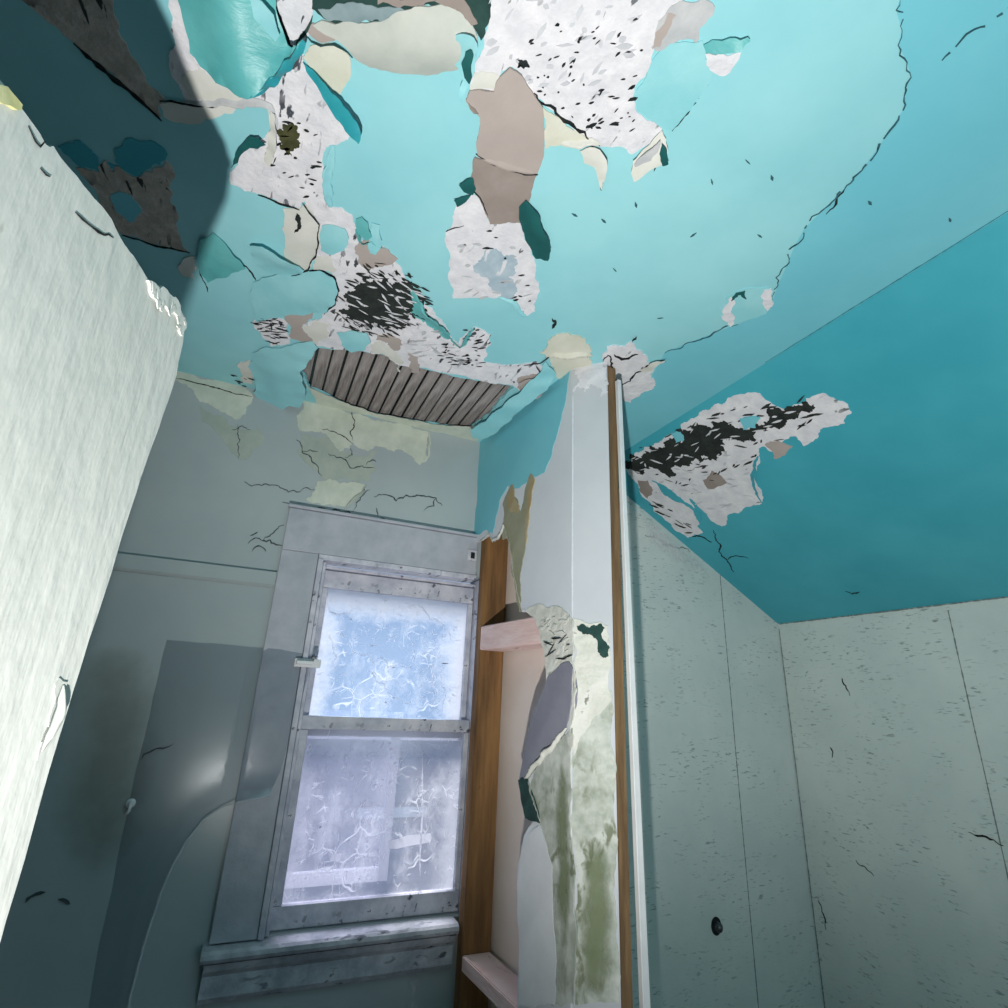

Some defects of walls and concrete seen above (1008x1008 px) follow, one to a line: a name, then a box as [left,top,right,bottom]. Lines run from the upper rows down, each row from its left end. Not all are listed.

crack [942,12,1003,61]
peeling [444,0,750,318]
crack [772,5,912,299]
peeling [22,0,666,508]
crack [665,324,739,353]
peeling [722,287,774,327]
crack [765,211,1008,363]
crack [246,440,442,551]
peeling [36,678,68,760]
peeling [480,473,611,1007]
damp [558,776,569,924]
damp [585,854,607,988]